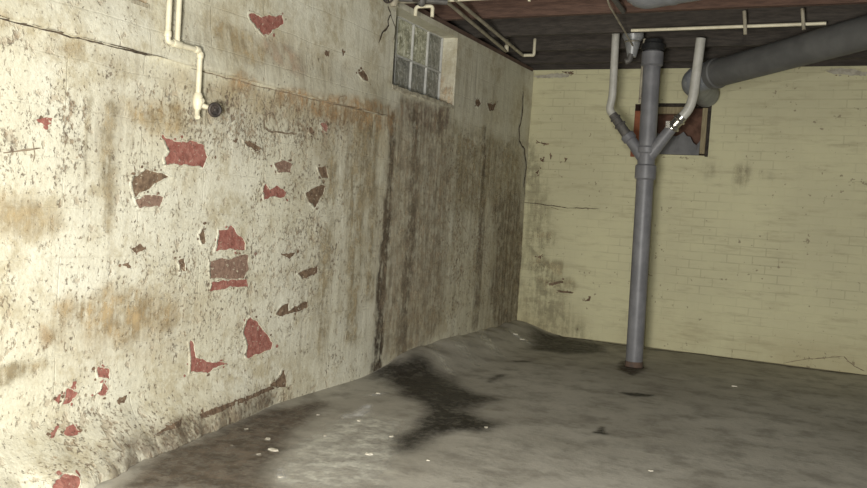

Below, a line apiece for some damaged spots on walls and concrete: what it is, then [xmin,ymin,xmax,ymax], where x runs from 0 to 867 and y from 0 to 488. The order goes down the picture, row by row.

crack [0,15,167,59]
peeling [247,10,286,38]
peeling [129,133,216,210]
crack [519,96,595,210]
peeling [118,244,146,268]
peeling [174,256,187,277]
peeling [197,222,257,293]
water stain [347,102,492,448]
water stain [492,199,600,353]
peeling [270,300,308,318]
peeling [184,339,228,377]
peeling [242,311,279,361]